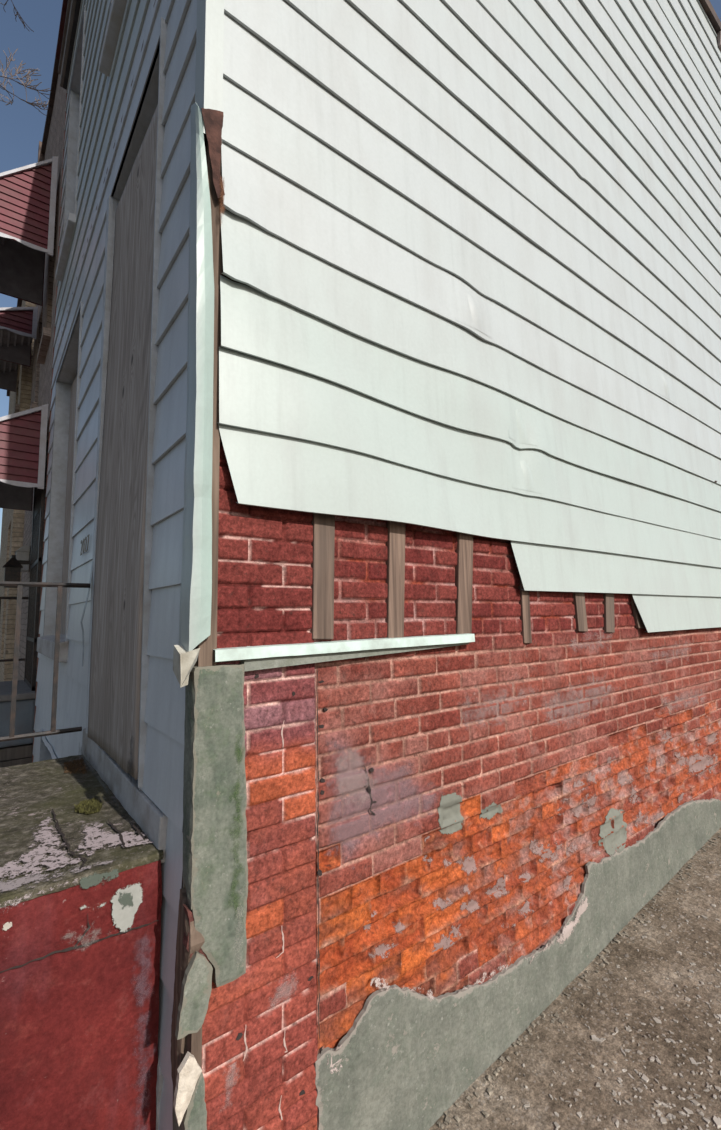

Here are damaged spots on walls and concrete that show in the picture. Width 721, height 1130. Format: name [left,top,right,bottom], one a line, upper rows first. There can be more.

peeling [0,817,154,932]
spalling [172,1052,207,1130]
spalling [175,663,259,1040]
spalling [299,700,721,1130]